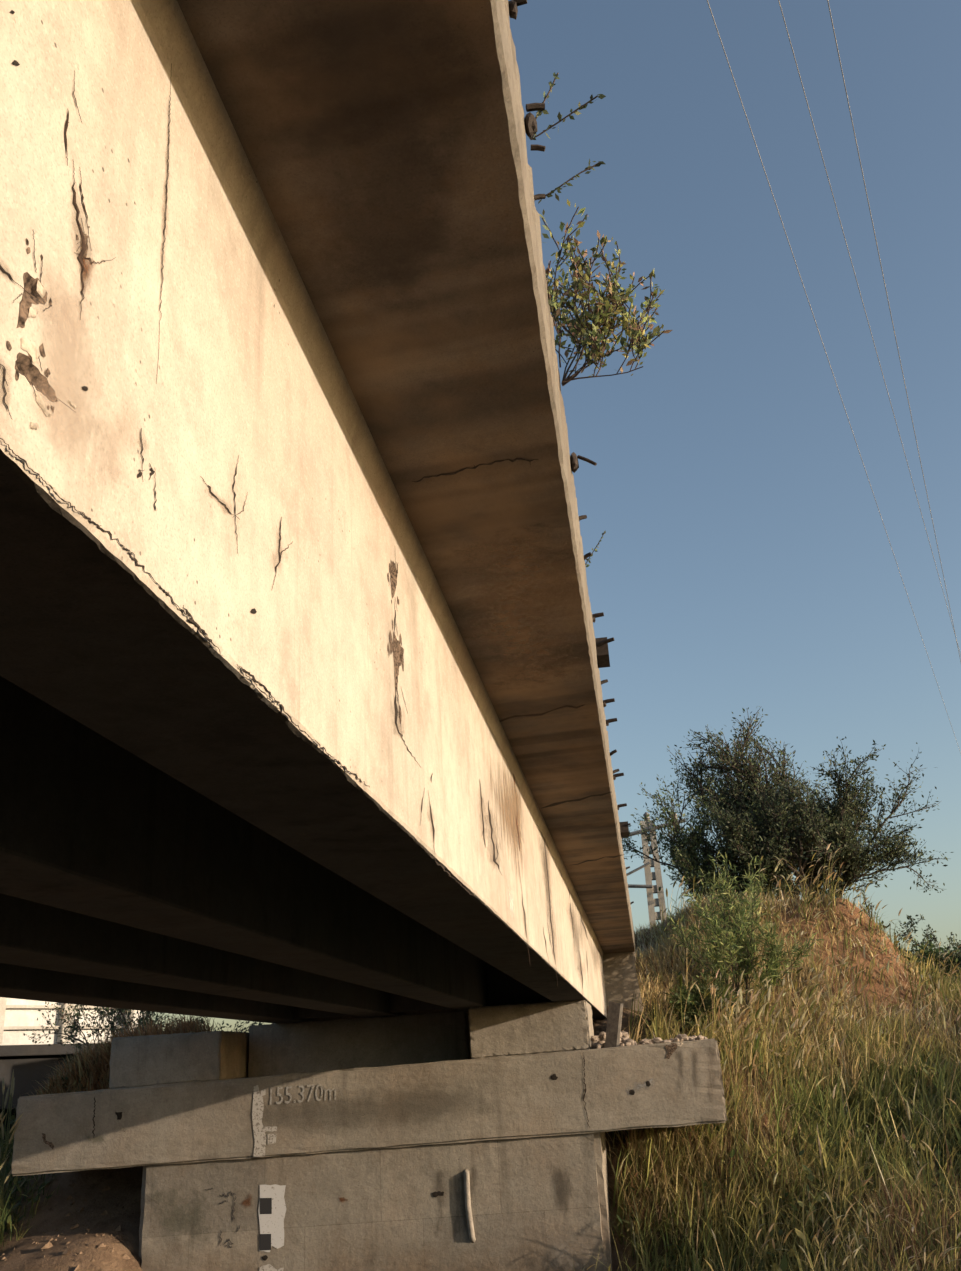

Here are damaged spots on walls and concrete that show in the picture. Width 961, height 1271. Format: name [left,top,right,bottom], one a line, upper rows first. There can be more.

spalling [7,231,77,430]
crack [65,70,116,320]
crack [156,63,172,384]
crack [0,364,370,787]
crack [412,458,539,482]
crack [582,1052,590,1128]